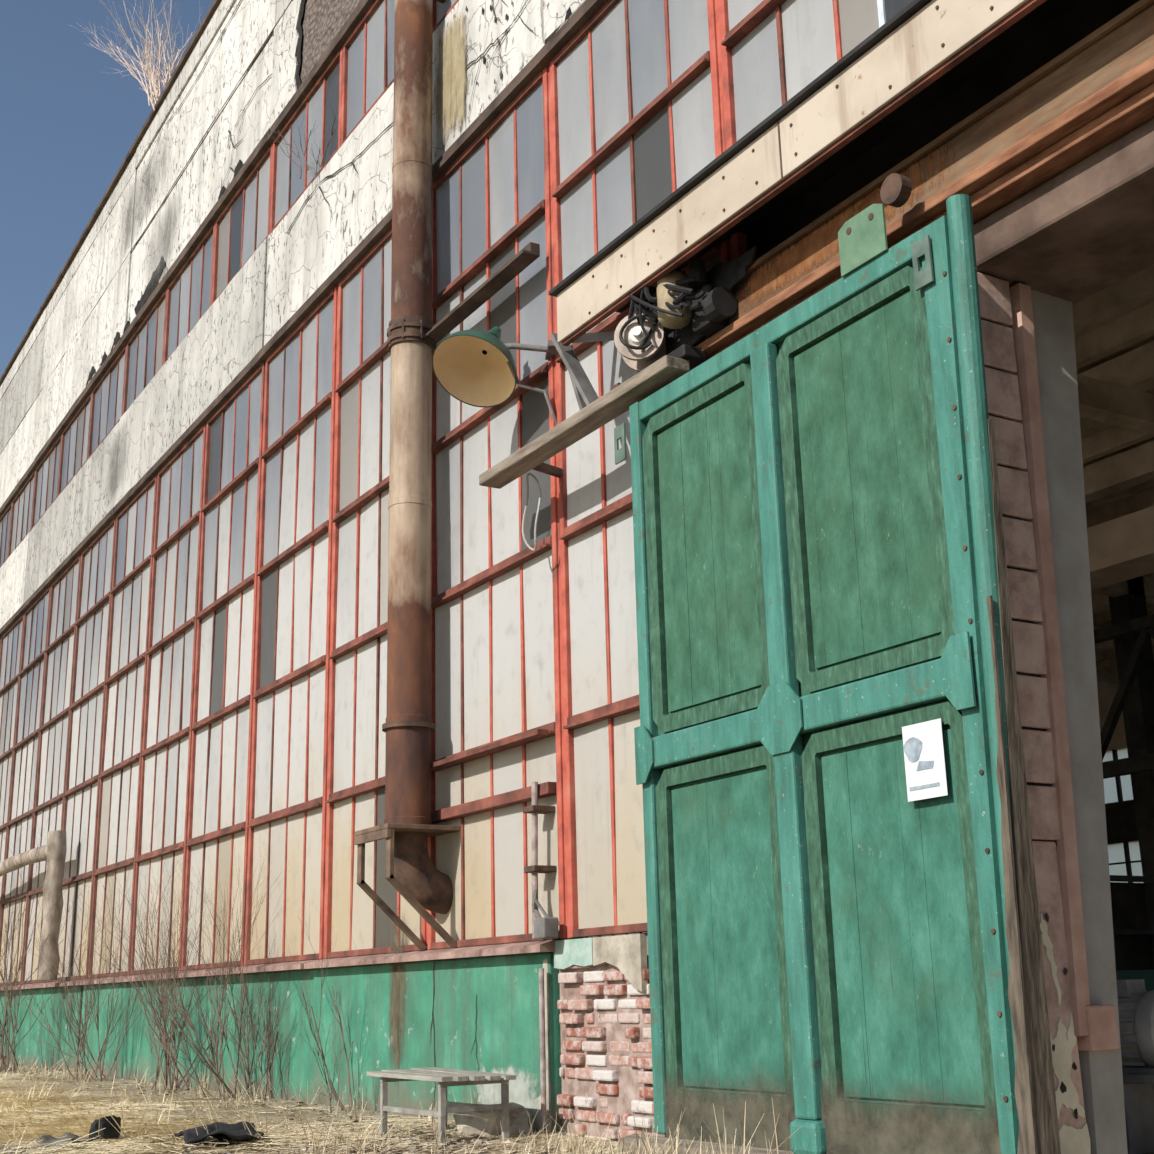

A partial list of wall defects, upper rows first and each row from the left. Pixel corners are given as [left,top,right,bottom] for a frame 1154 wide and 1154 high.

crack [88,0,293,317]
crack [287,122,393,233]
crack [460,0,545,127]
spalling [532,934,655,1139]
peeling [1040,912,1091,1154]